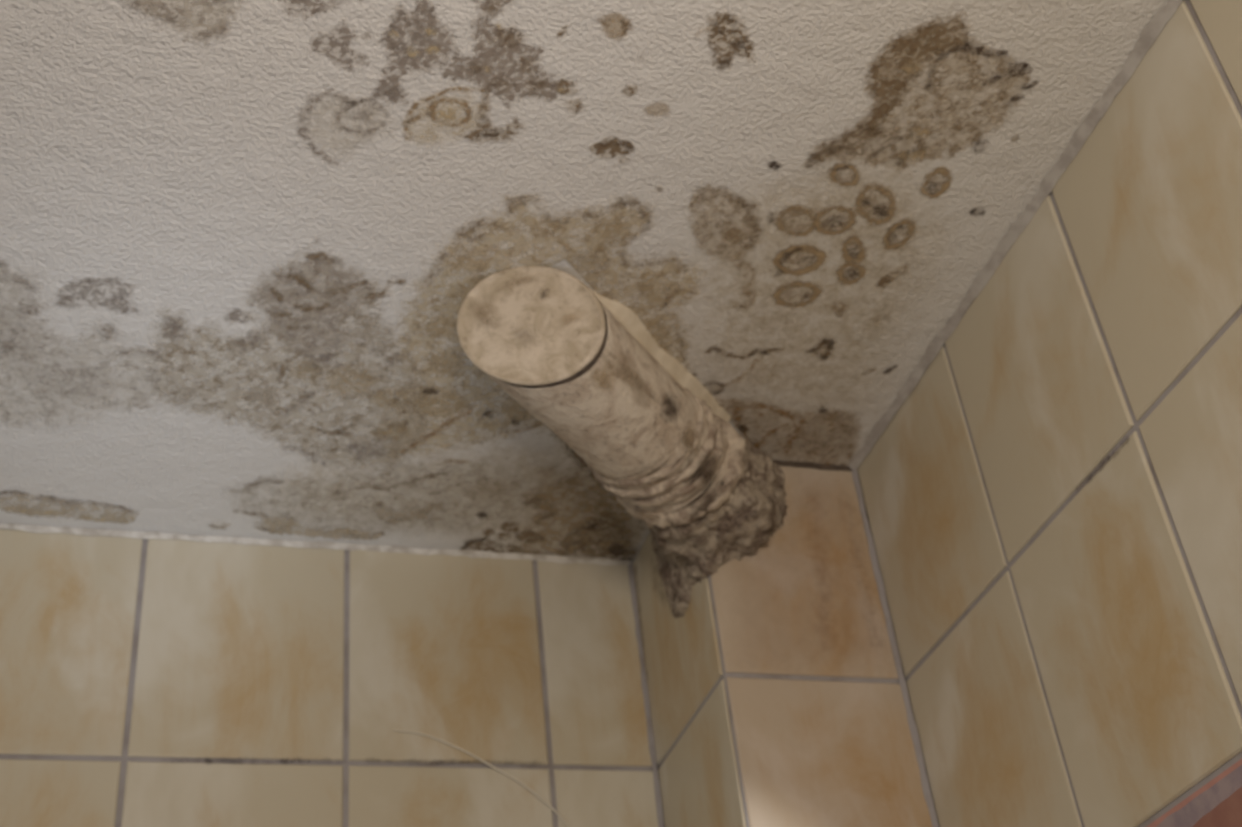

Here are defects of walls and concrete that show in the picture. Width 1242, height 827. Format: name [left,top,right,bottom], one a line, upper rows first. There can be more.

water stain [279,0,323,17]
water stain [312,0,582,141]
water stain [725,21,1037,306]
water stain [147,197,696,468]
peeling [0,491,134,524]
water stain [461,450,636,561]
water stain [691,456,717,515]